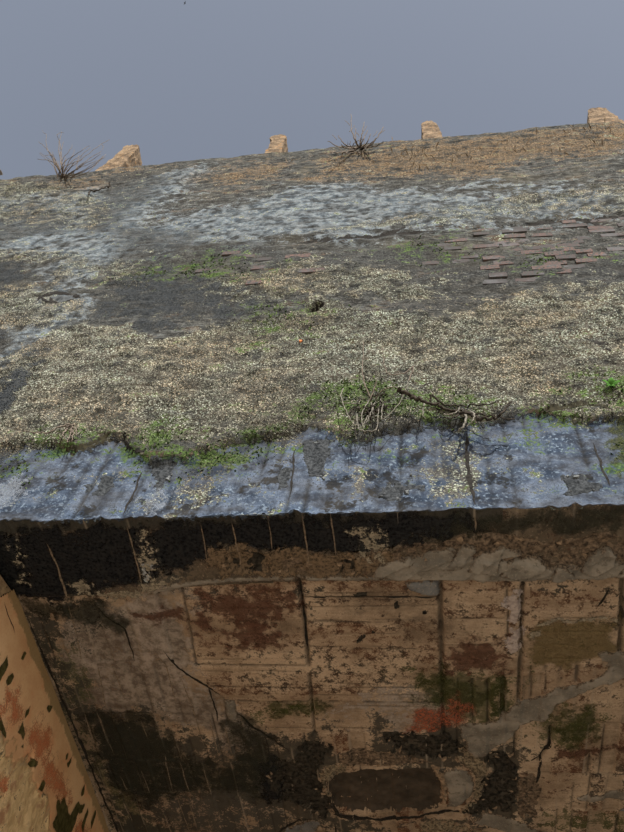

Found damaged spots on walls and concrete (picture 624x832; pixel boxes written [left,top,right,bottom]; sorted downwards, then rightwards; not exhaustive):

water stain [0,259,47,304]
water stain [88,266,260,333]
water stain [0,347,51,414]
water stain [0,506,624,634]
crack [4,602,119,832]
water stain [75,709,292,809]
crack [165,653,221,720]
crack [238,713,290,766]
spalling [266,729,465,819]
crack [531,728,552,785]
crack [279,801,463,832]